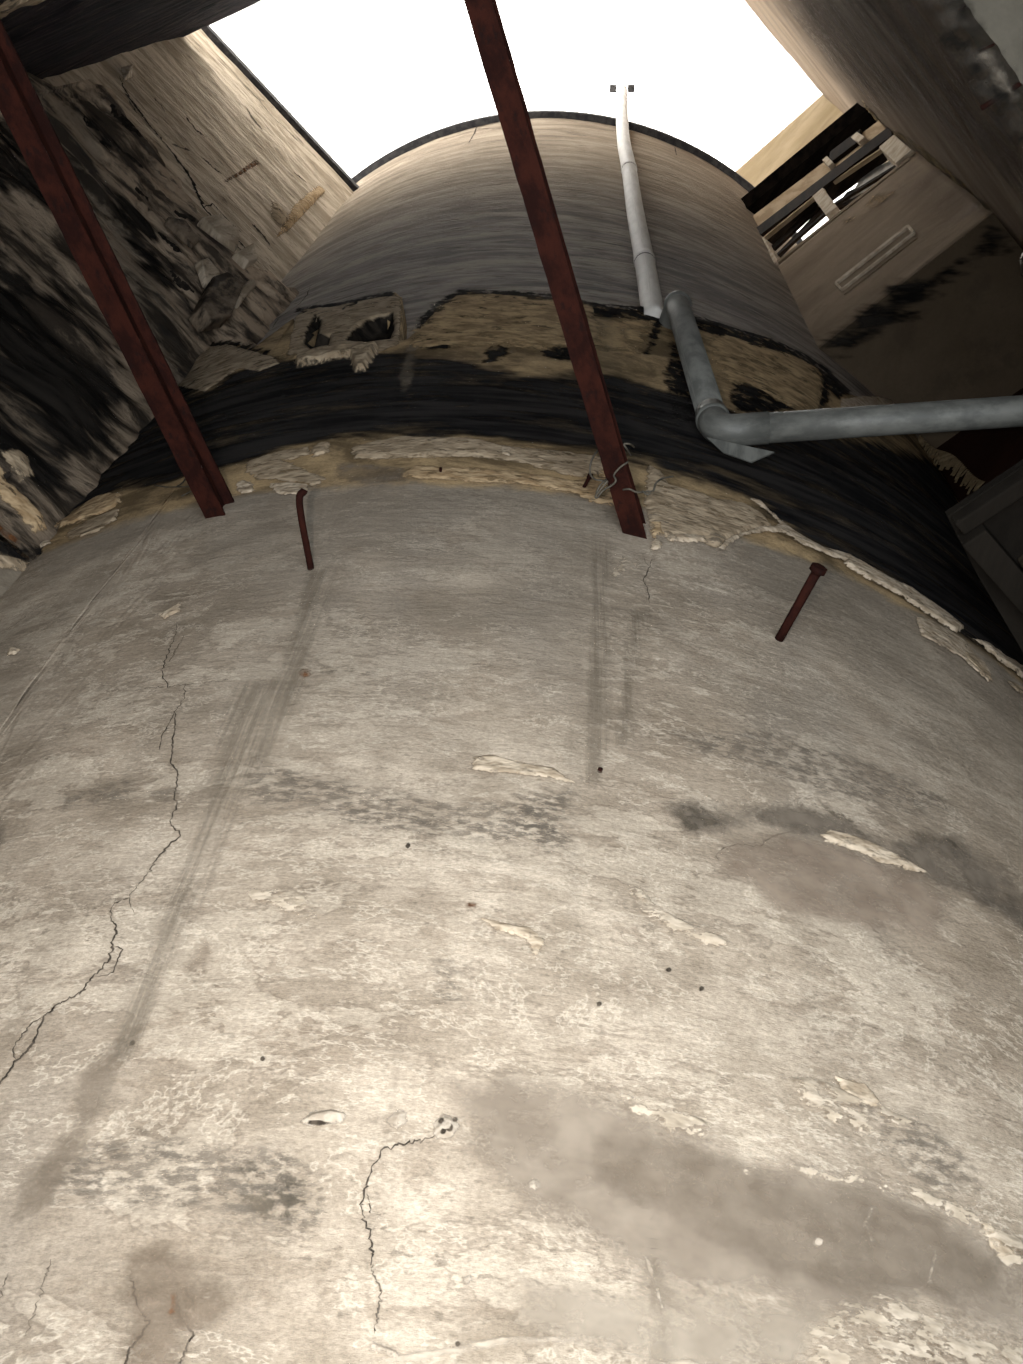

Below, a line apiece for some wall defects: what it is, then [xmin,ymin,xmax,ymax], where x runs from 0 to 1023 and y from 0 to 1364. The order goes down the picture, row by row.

flaking render [179,294,567,393]
flaking render [583,304,648,353]
flaking render [0,450,122,547]
flaking render [236,436,614,506]
flaking render [0,553,30,572]
flaking render [158,603,181,619]
flaking render [643,466,1023,693]
crack [0,624,227,1084]
leakage [29,1141,75,1206]
crack [359,1136,434,1334]
crack [124,1271,195,1364]